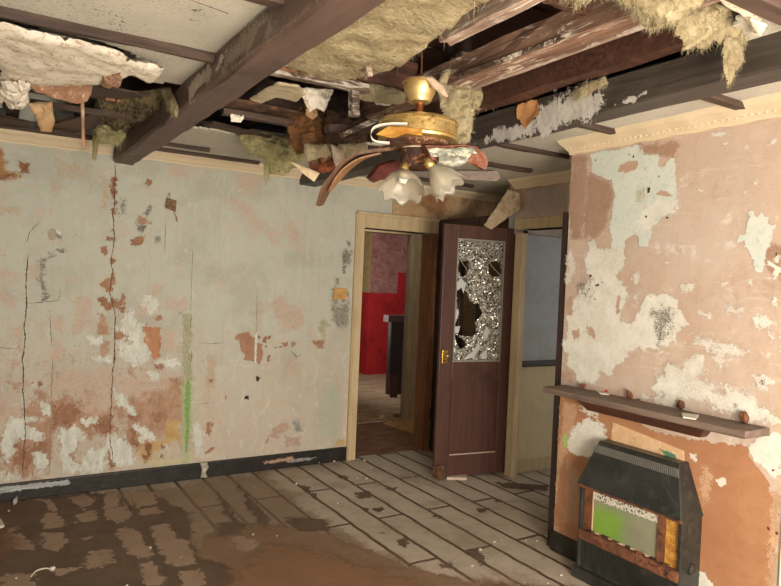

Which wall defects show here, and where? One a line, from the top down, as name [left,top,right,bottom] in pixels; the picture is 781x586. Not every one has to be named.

peeling [516,100,539,129]
crack [1,225,61,478]
spalling [0,245,185,483]
crack [109,164,118,459]
spalling [190,420,215,458]
spalling [235,332,298,364]
spalling [553,145,781,586]